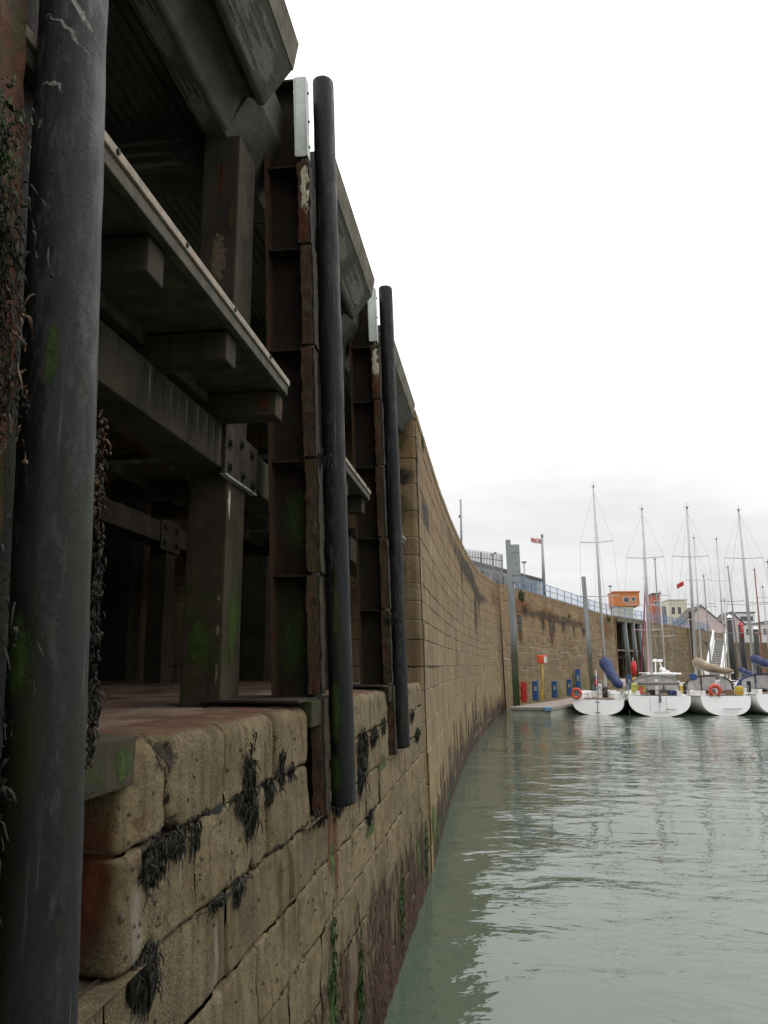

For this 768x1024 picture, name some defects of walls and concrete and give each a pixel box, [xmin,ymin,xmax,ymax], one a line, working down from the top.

water stain [454,545,484,632]
water stain [314,693,506,1024]